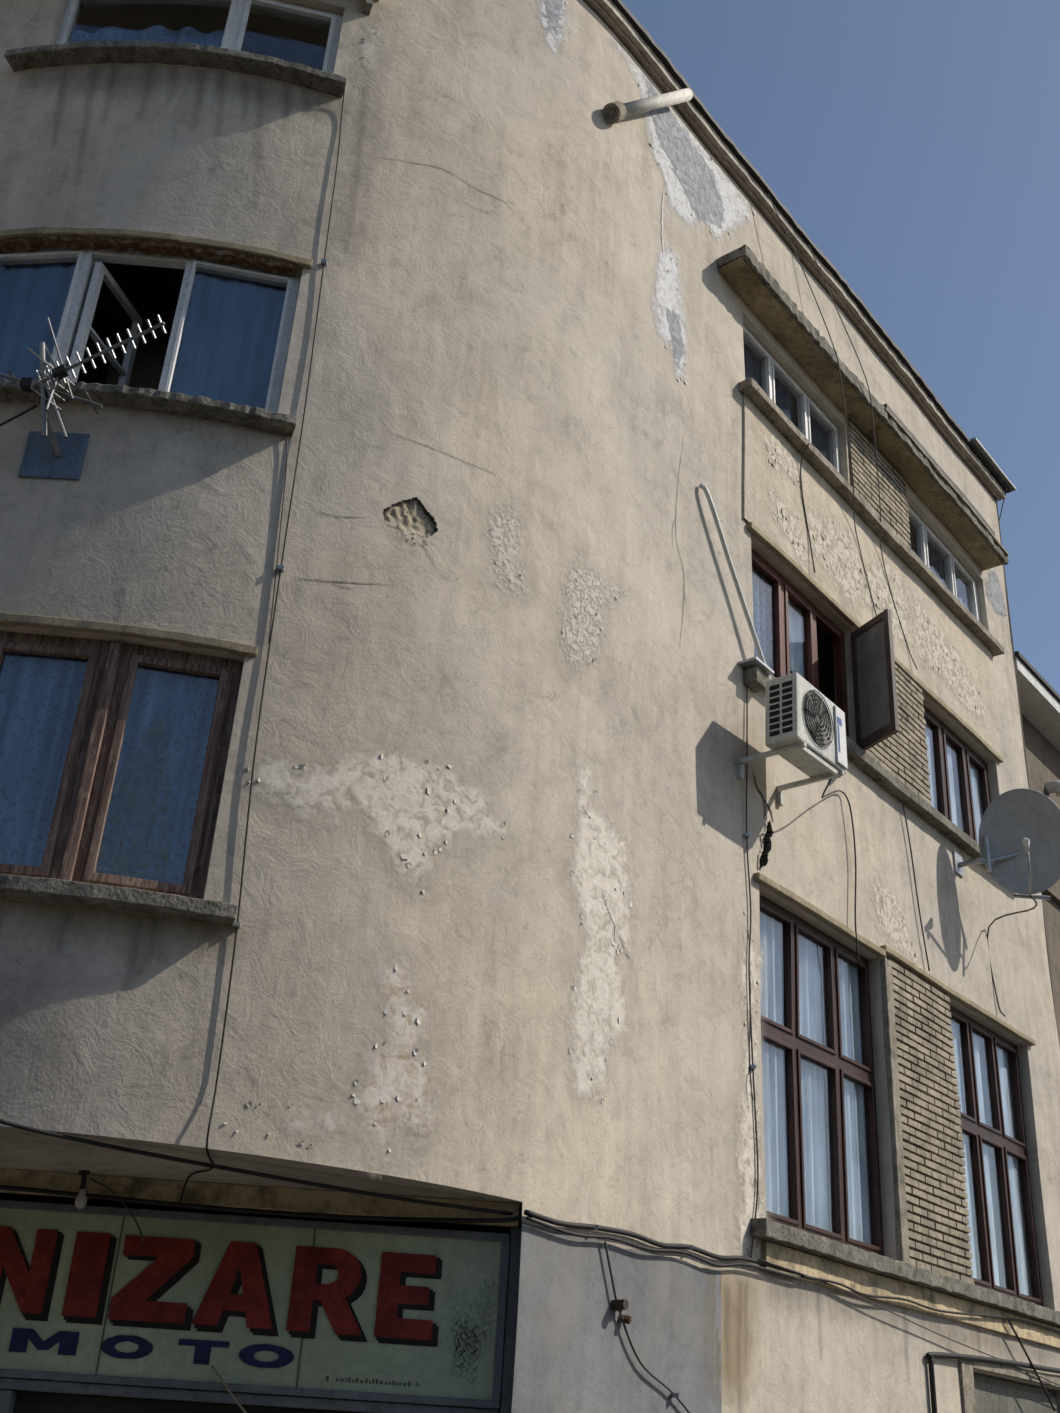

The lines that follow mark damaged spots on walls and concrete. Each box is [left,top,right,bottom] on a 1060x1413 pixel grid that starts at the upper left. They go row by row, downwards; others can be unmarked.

peeling [540,0,569,53]
peeling [617,44,756,384]
spalling [383,497,438,555]
peeling [486,503,529,596]
peeling [560,554,631,669]
peeling [246,750,508,894]
crack [754,775,774,871]
peeling [567,763,635,1103]
peeling [268,953,442,1162]